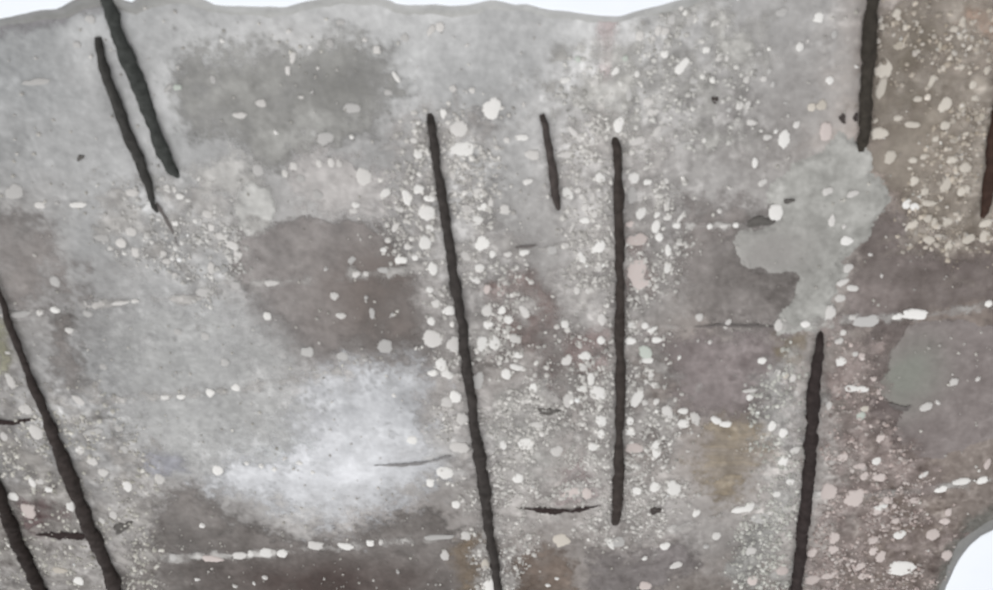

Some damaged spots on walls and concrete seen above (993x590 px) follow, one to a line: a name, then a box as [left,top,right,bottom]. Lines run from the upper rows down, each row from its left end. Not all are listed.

crack [0,418,35,426]
crack [520,505,601,515]
crack [36,531,85,540]